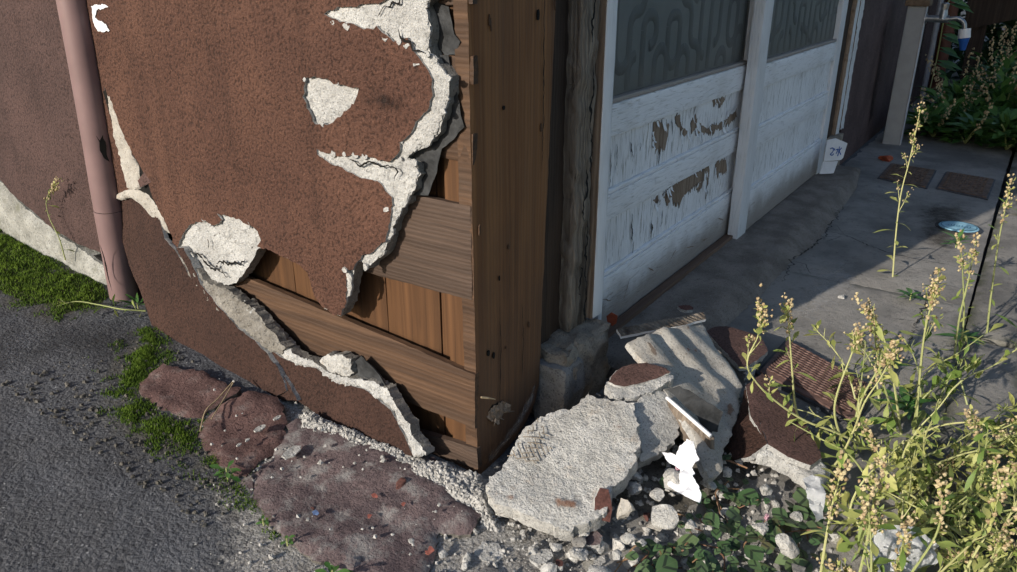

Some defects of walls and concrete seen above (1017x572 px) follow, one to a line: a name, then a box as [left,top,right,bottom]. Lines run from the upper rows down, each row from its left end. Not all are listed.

spalling [303,77,352,127]
spalling [318,0,452,271]
peeling [653,154,730,211]
peeling [652,96,739,153]
spalling [177,215,435,458]
crack [782,209,949,345]